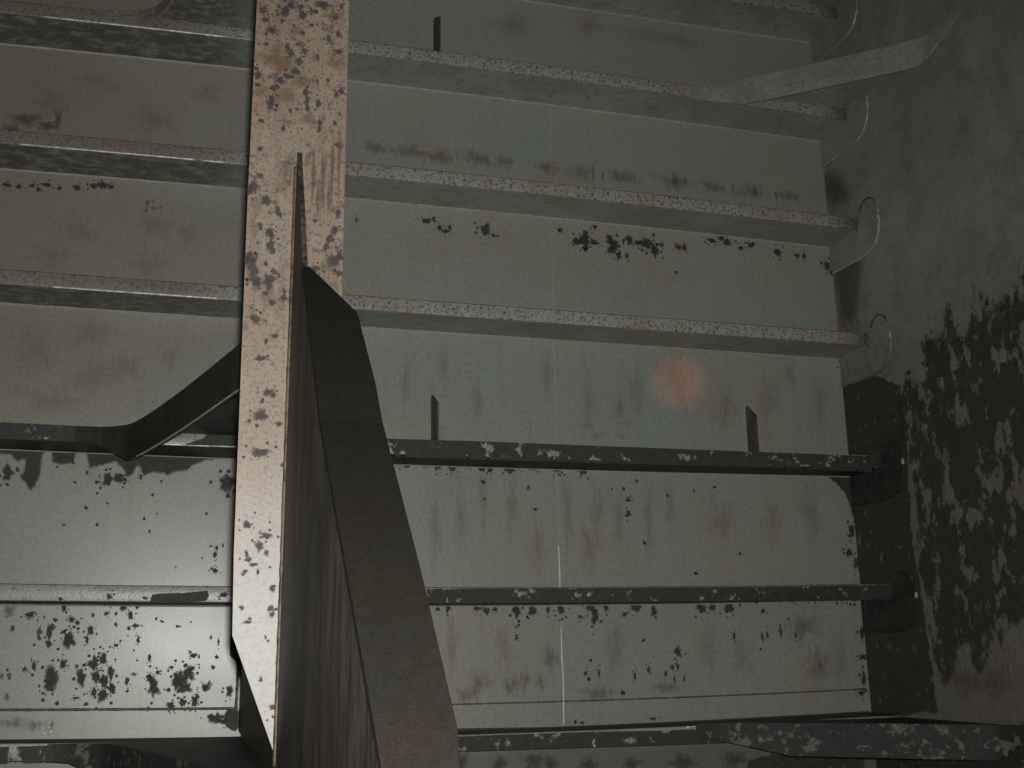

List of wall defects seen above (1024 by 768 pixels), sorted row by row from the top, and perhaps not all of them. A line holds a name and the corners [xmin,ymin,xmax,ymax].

peeling [890,274,1024,684]